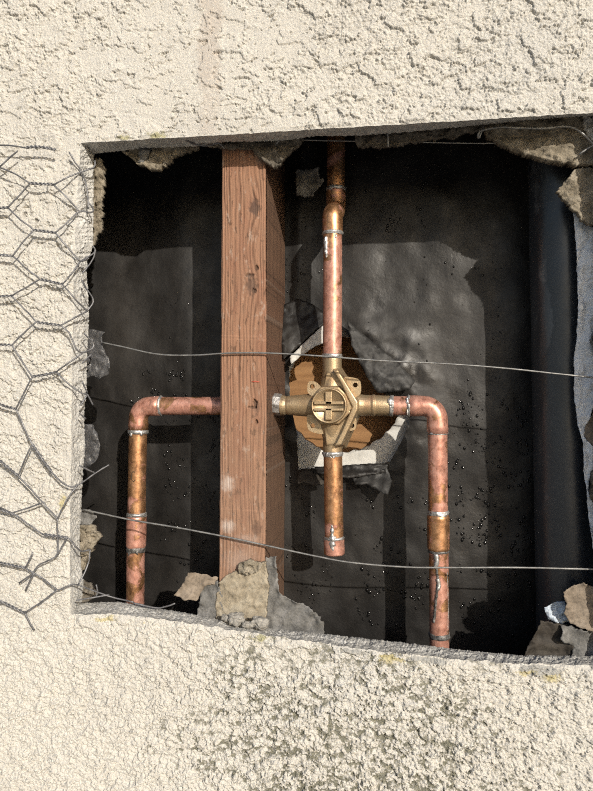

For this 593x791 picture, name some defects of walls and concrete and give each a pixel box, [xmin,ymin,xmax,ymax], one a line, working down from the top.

spalling [93,157,107,247]
spalling [122,138,304,173]
spalling [355,116,593,226]
spalling [80,523,103,603]
spalling [215,558,270,621]